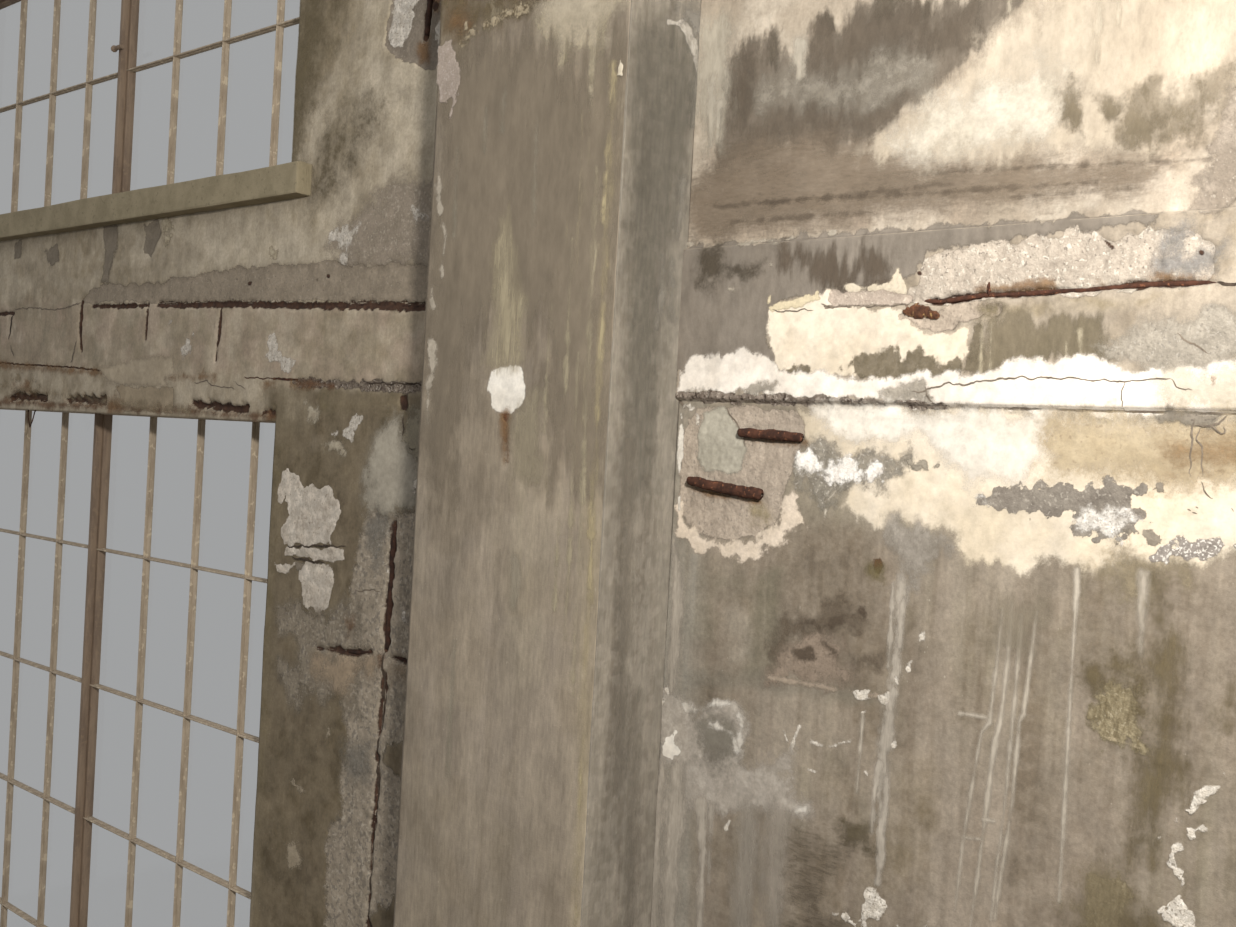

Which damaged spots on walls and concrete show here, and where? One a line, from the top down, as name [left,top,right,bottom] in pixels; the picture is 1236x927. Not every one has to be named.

spalling [385,0,461,117]
peeling [534,0,622,100]
water stain [655,0,1218,379]
rust [0,300,426,363]
spalling [766,225,1236,377]
crack [914,375,1171,393]
peeling [674,390,1236,599]
spalling [274,468,415,927]
peeling [1157,785,1220,927]